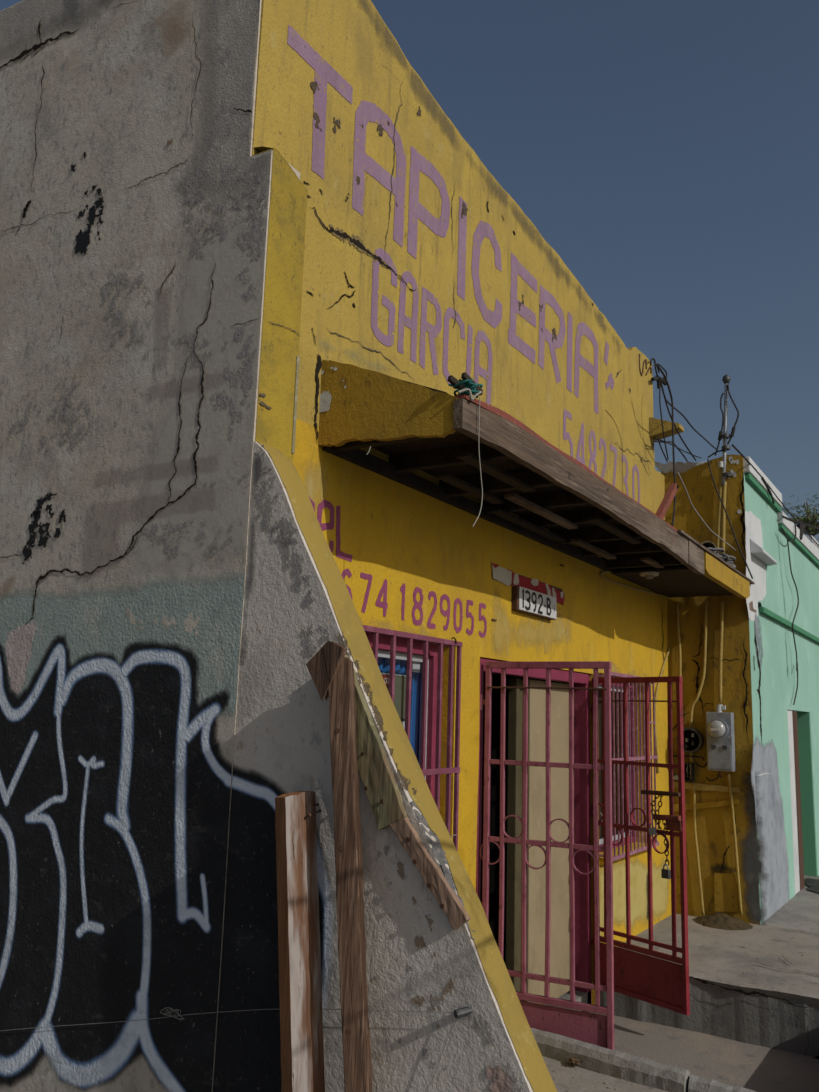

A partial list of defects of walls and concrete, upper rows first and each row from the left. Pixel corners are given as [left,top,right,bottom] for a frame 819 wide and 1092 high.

crack [0,19,81,235]
crack [122,1,201,191]
crack [27,65,416,623]
crack [738,467,746,547]
crack [672,623,762,742]
peeling [467,1011,521,1092]
crack [689,976,813,1008]